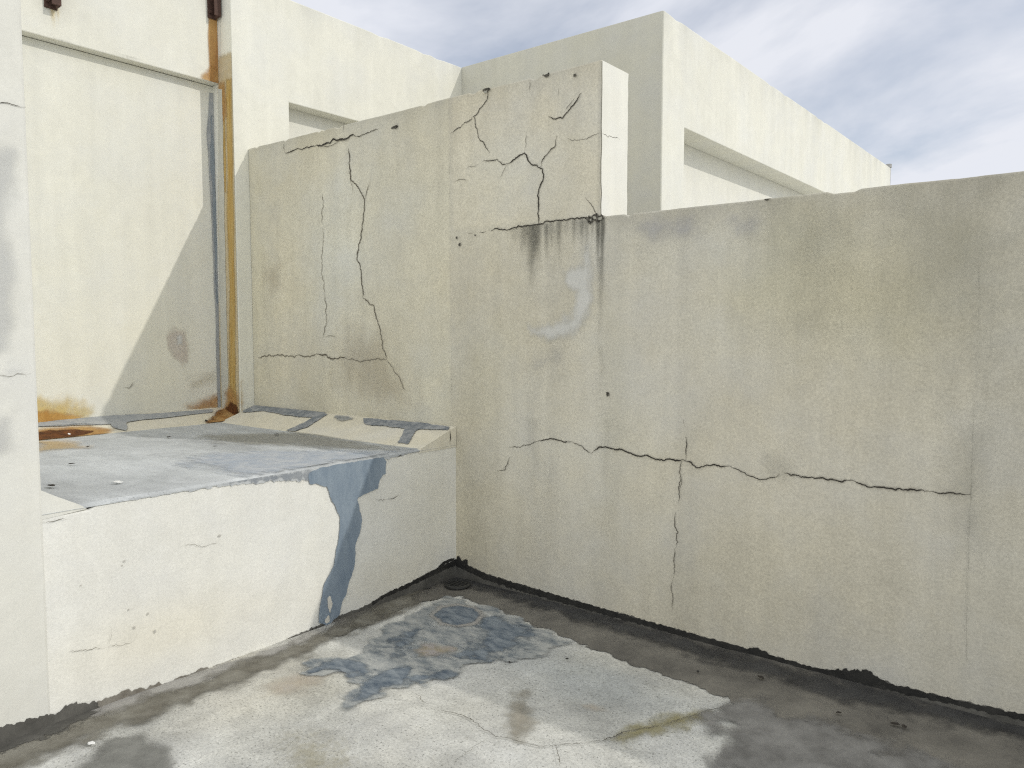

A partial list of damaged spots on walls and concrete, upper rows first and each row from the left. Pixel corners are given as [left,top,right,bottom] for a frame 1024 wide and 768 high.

rust [194,18,239,423]
crack [260,125,405,390]
crack [450,91,617,234]
damp [596,219,604,246]
rust [37,399,110,450]
crack [499,421,971,609]